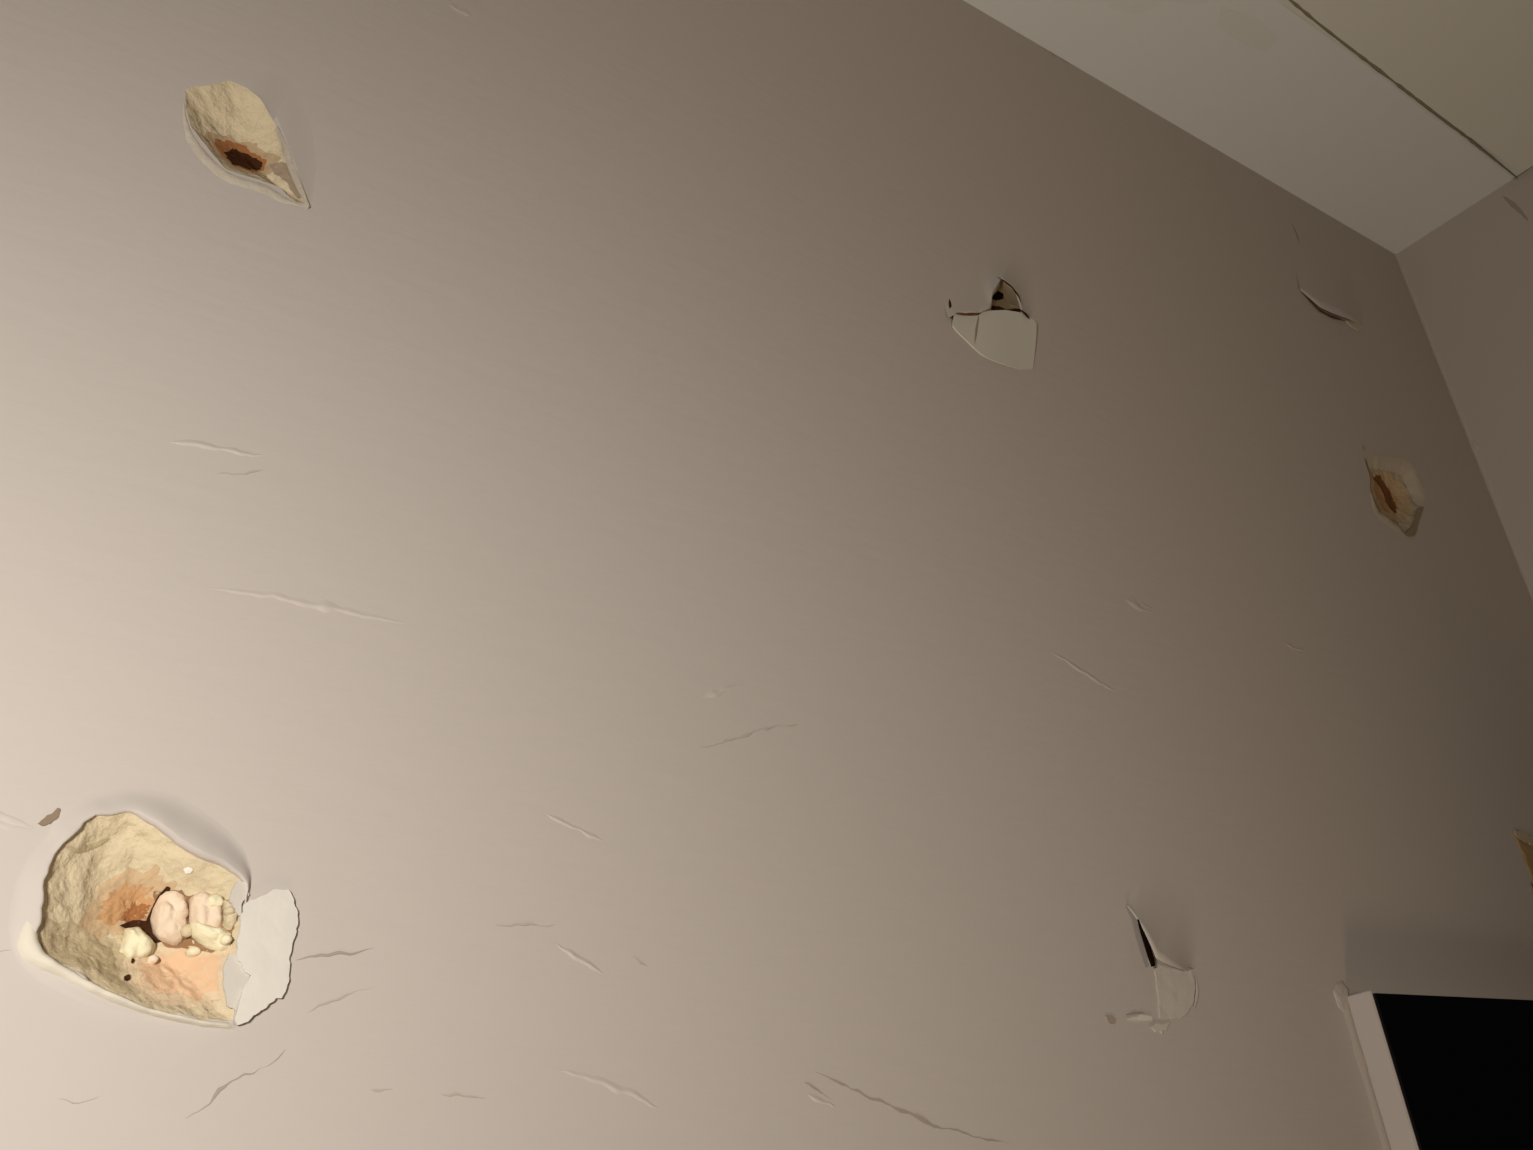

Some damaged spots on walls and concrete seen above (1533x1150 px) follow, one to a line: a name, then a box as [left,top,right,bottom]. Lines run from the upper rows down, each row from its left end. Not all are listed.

flaking render [183,69,316,209]
hole [943,248,1037,370]
flaking render [1363,453,1427,537]
flaking render [8,788,298,1032]
crack [804,1072,1009,1144]